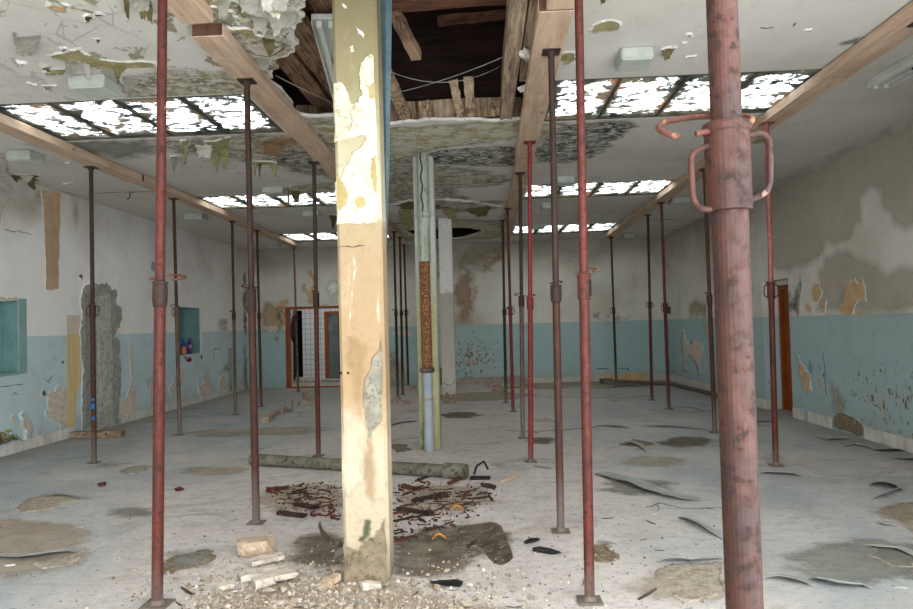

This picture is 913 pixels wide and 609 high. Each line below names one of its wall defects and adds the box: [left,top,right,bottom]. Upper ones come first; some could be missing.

peeling [44,1,73,13]
peeling [82,11,106,24]
peeling [123,0,156,24]
peeling [12,32,157,93]
peeling [328,53,414,231]
leakage [535,121,636,163]
leakage [388,121,520,321]
peeling [435,198,505,219]
spalling [79,275,136,431]
peeling [0,409,34,451]
spalling [363,330,412,440]
spalling [833,364,913,438]